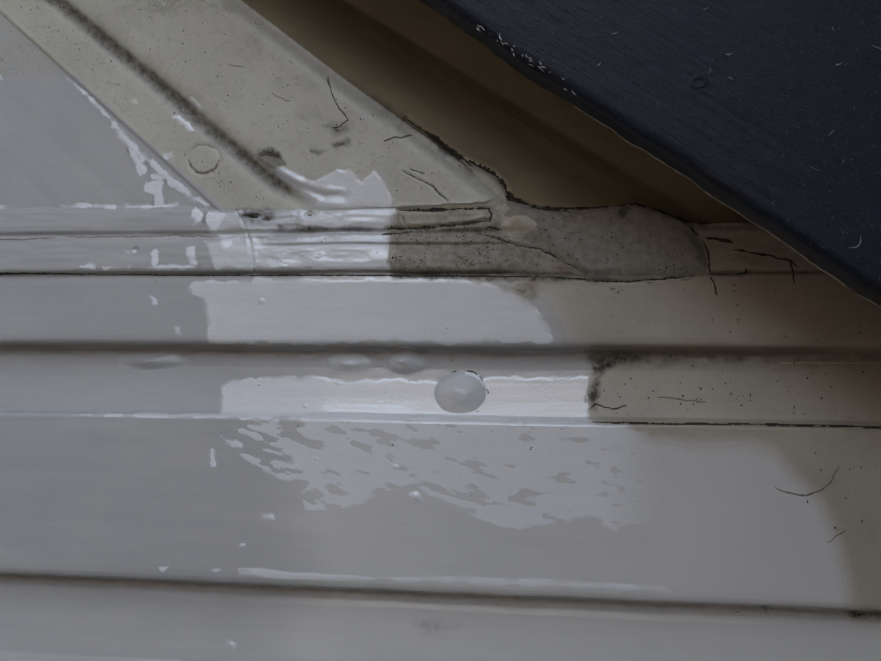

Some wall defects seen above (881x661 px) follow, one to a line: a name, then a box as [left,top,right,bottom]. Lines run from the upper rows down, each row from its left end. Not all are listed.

crack [327,77,349,128]
crack [0,119,798,296]
leakage [390,210,629,293]